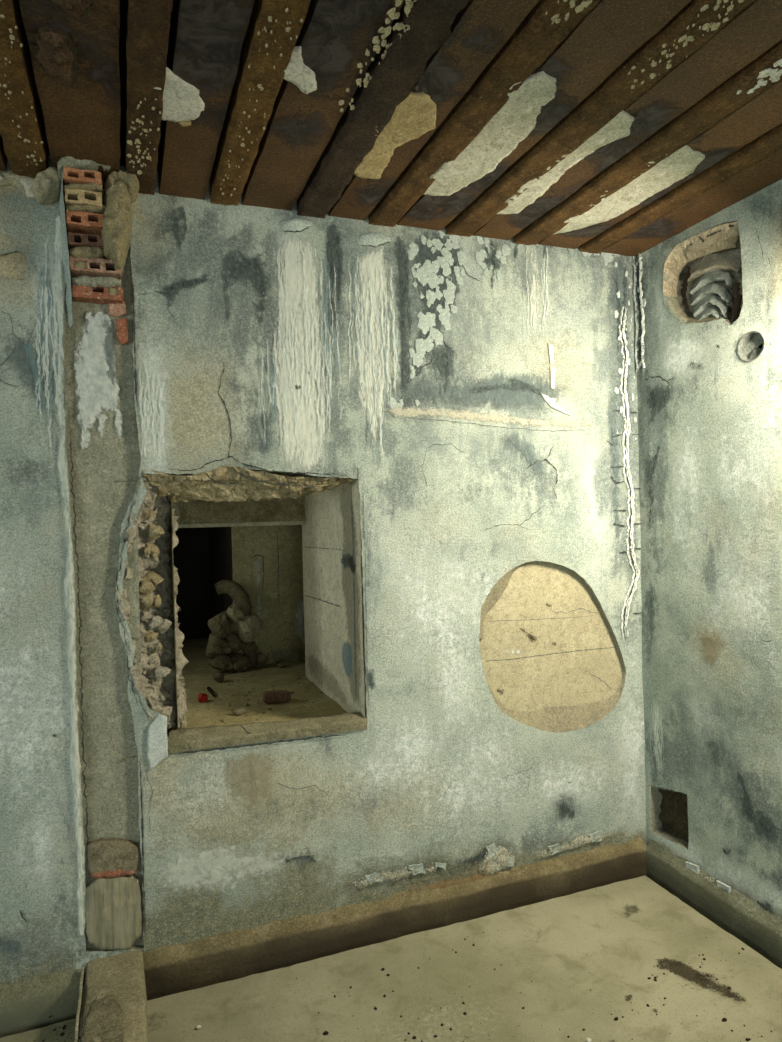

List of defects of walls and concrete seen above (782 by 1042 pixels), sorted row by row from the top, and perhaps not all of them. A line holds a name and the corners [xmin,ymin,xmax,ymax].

corrosion [30,25,81,89]
crack [0,311,40,387]
damp [160,274,209,306]
damp [222,224,554,473]
peeling [406,227,511,379]
damp [608,258,647,537]
damp [647,385,670,422]
flaking render [663,221,743,324]
damp [645,446,660,522]
flaking render [53,216,129,936]
spalling [115,466,360,730]
spalling [479,561,626,732]